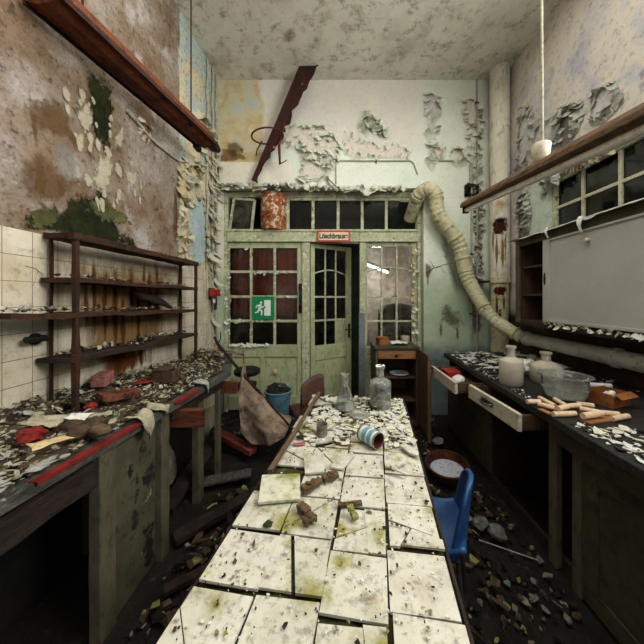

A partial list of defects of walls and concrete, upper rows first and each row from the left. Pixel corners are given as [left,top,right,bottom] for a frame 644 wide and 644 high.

water stain [25,99,77,198]
peeling [60,86,143,212]
water stain [94,99,111,141]
water stain [221,143,245,161]
peeling [423,92,485,193]
peeling [513,80,624,173]
water stain [31,193,121,241]
peeling [176,108,412,348]
rust [492,218,508,266]
peeling [514,188,532,239]
rust [80,264,167,378]
rust [493,286,507,317]